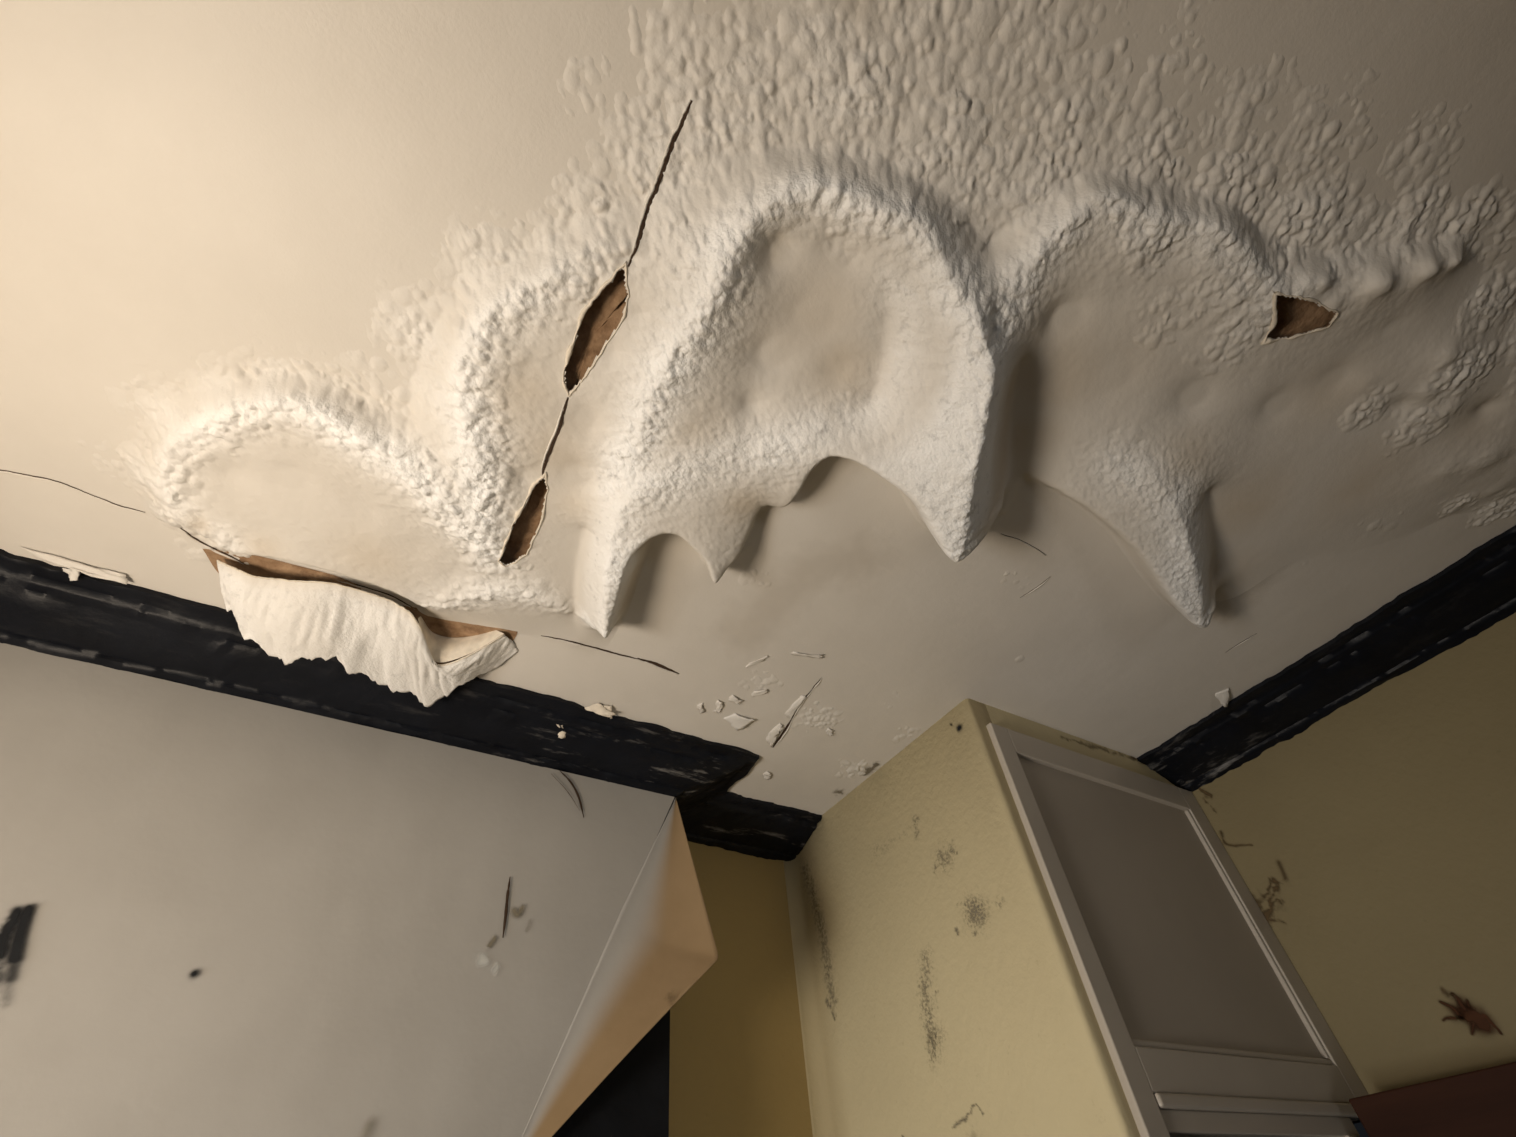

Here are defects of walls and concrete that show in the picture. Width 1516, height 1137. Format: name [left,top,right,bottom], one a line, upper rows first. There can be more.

crack [627,100,692,267]
crack [541,397,568,481]
peeling [216,560,518,707]
peeling [697,689,768,731]
peeling [766,695,806,747]